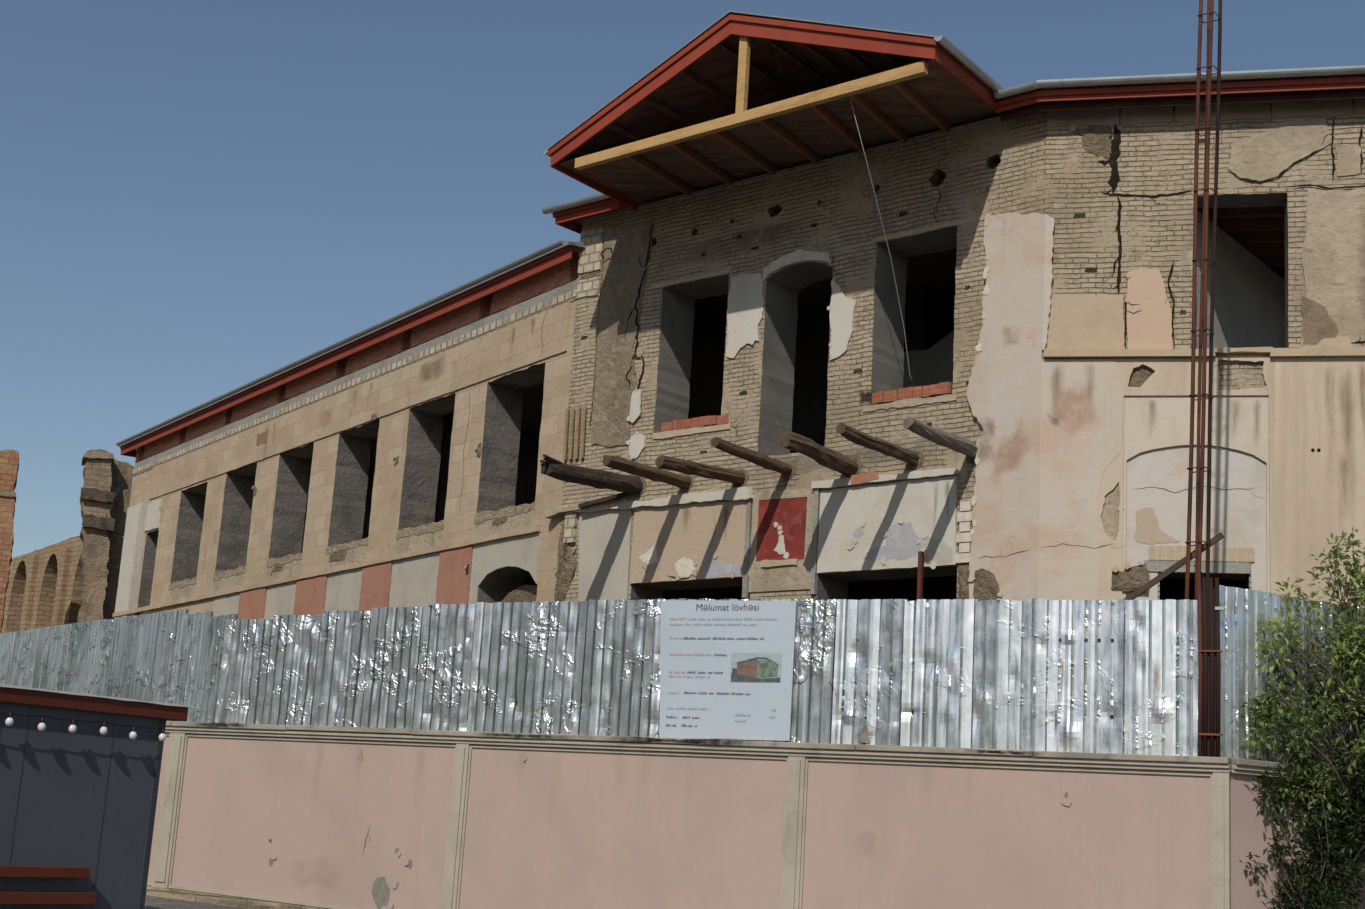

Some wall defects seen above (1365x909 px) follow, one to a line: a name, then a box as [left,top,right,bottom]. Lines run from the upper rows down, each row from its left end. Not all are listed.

crack [1228,117,1365,192]
crack [1101,124,1193,347]
peeling [965,257,990,296]
crack [590,223,653,425]
spalling [1128,365,1154,387]
spalling [1101,483,1124,541]
peeling [639,545,658,572]
peeling [674,552,743,580]
peeling [847,518,1003,601]